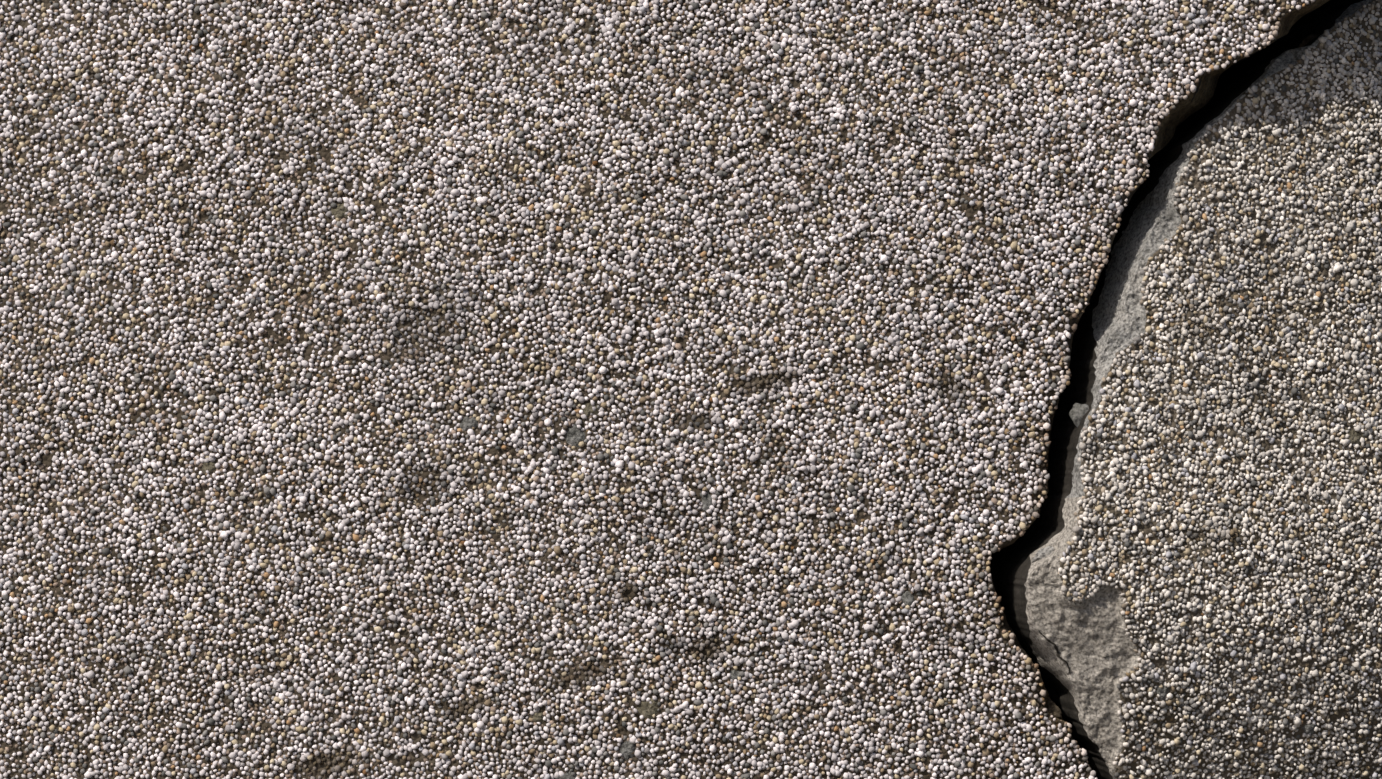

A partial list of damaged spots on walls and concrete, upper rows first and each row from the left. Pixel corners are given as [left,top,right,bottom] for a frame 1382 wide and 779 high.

spalling [1024,497,1140,777]
crack [988,0,1373,779]